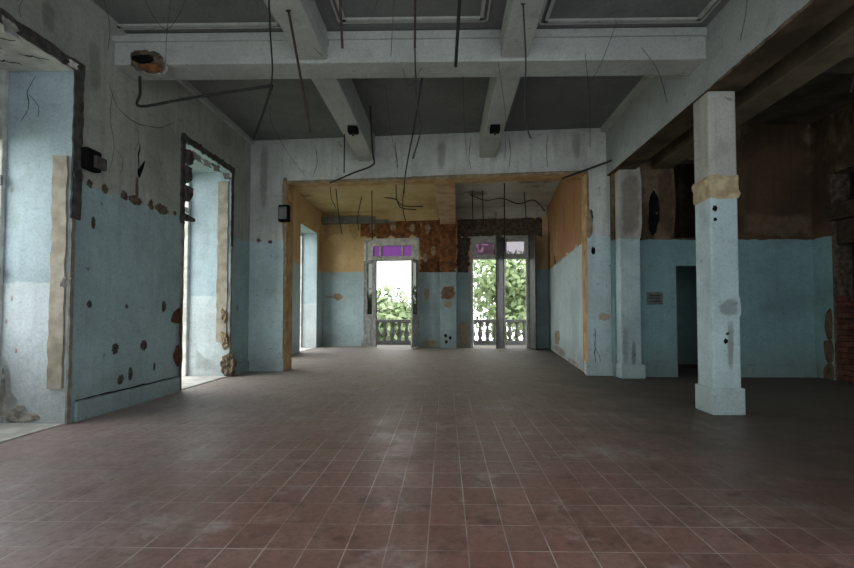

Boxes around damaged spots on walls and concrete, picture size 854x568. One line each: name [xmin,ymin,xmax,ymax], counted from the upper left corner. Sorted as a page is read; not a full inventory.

peeling [0,15,48,64]
spalling [130,50,168,76]
flaking render [282,170,595,254]
flaking render [360,217,579,279]
flaking render [444,317,471,348]